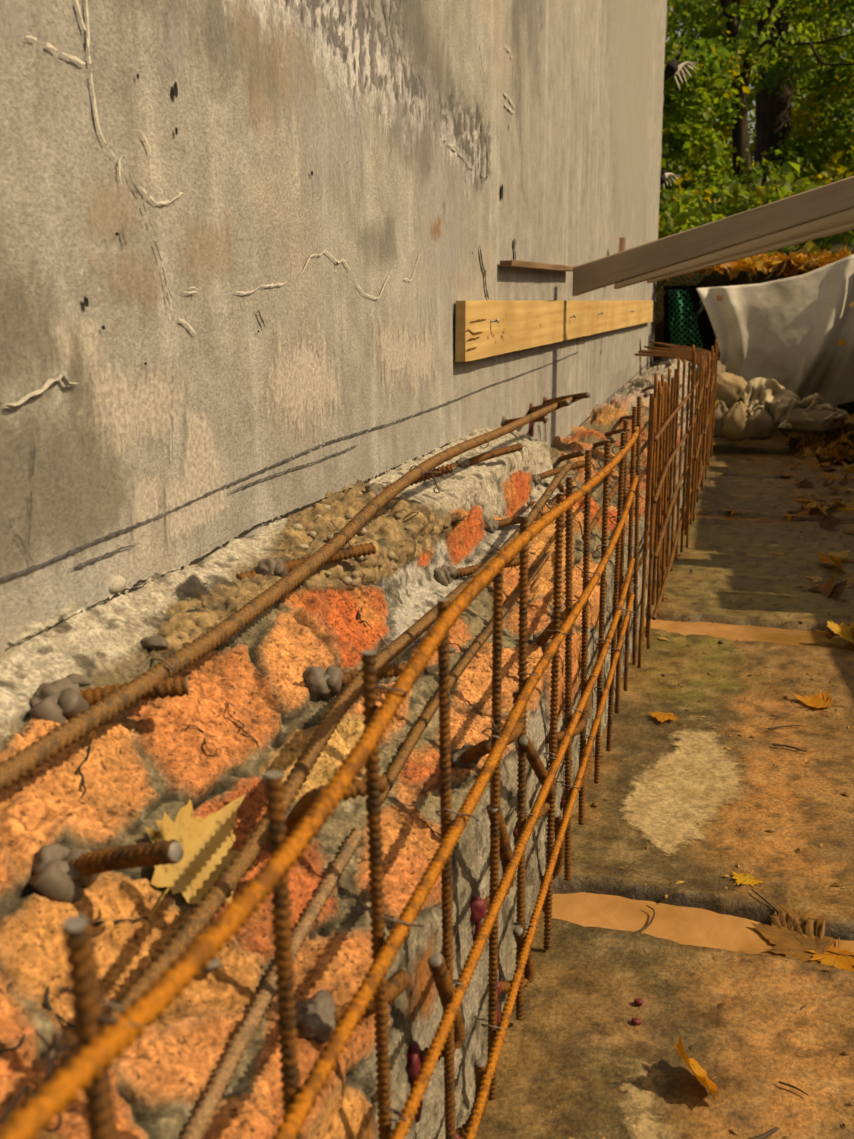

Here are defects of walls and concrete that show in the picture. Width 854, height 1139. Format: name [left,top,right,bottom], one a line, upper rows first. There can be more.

crack [26,0,196,334]
leakage [221,0,491,199]
crack [236,250,423,327]
crack [0,375,77,408]
crack [5,426,496,651]
spalling [0,397,581,815]
spalling [621,729,745,856]
spalling [102,809,270,1028]
peeling [290,827,363,962]
spalling [0,1040,79,1125]
peeling [179,965,278,1139]
spalling [619,1059,675,1139]